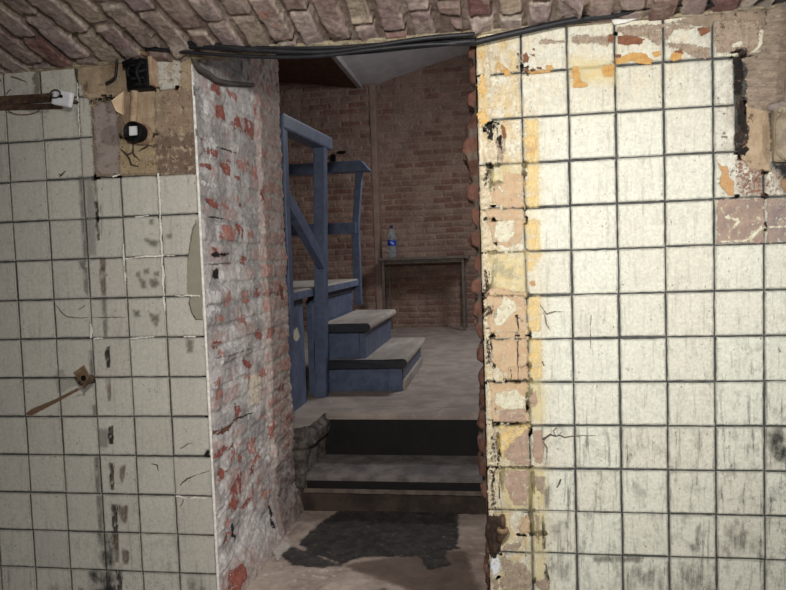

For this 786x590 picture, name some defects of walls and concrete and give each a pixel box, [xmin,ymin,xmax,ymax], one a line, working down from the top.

flaking render [78,59,258,180]
peeling [219,224,254,242]
peeling [216,280,284,326]
peeling [476,2,786,590]
peeling [255,326,275,340]
peeling [242,360,266,380]
crack [542,428,595,459]
damp [769,432,786,461]
peeling [213,437,271,544]
damp [90,480,123,590]
peeling [225,563,247,590]